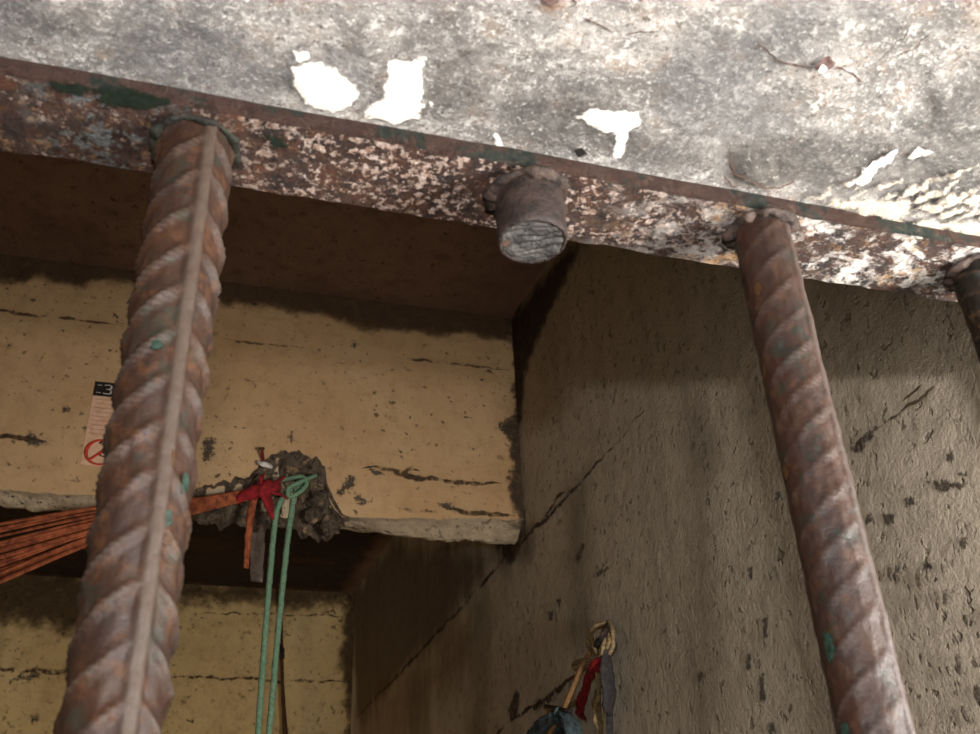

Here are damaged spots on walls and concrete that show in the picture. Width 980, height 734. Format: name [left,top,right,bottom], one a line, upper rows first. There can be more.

peeling [291,51,433,125]
spalling [815,56,835,74]
peeling [576,109,642,159]
peeling [909,148,932,159]
flaking render [809,150,980,237]
crack [878,370,954,428]
crack [0,433,47,442]
spalling [192,431,369,543]
crack [357,411,644,717]
crack [497,671,584,734]